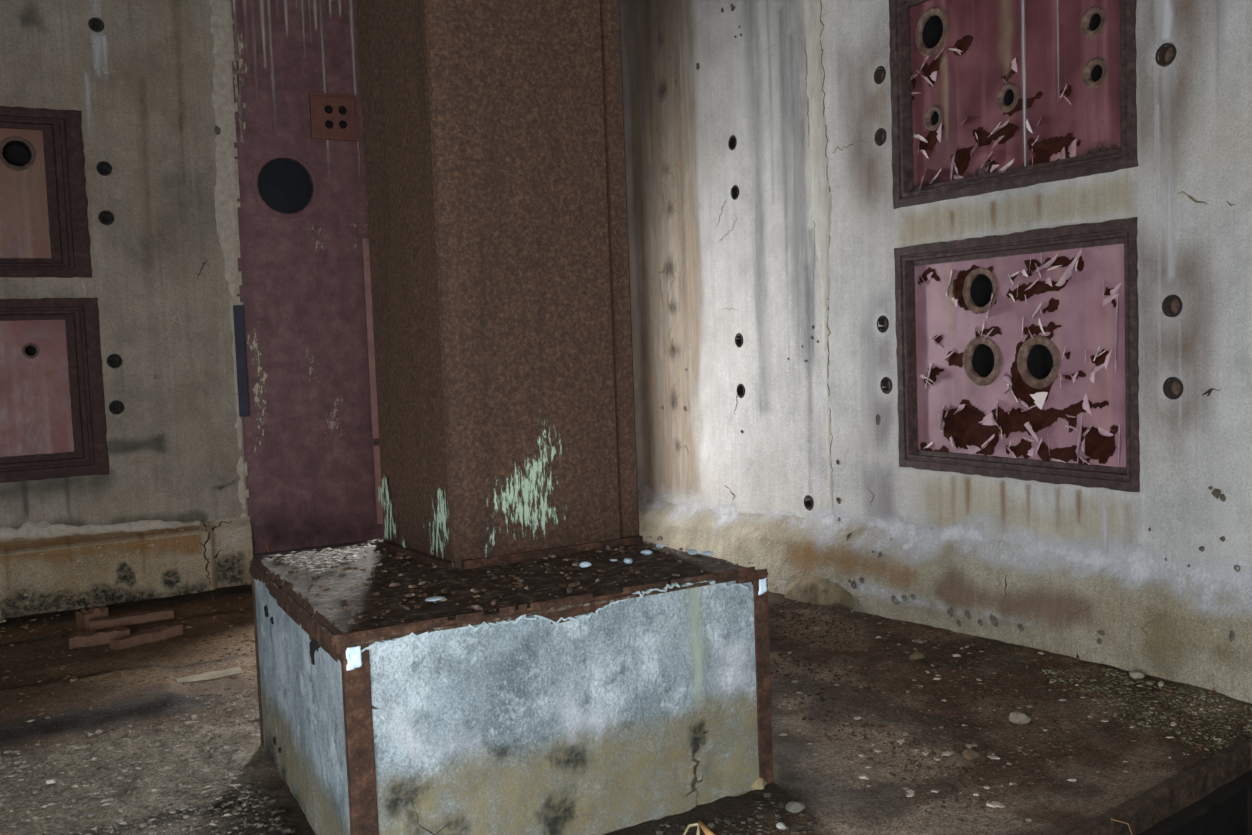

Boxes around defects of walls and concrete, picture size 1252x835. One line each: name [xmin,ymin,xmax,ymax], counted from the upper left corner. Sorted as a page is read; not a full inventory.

damp [302,0,356,95]
peeling [908,35,973,101]
peeling [913,91,1081,191]
peeling [917,248,1122,467]
damp [0,563,205,618]
crack [200,521,232,585]
peeling [429,489,454,568]
rust [249,535,767,662]
peeling [485,423,565,557]
damp [857,509,1252,610]
damp [377,587,759,835]
crack [684,730,709,806]